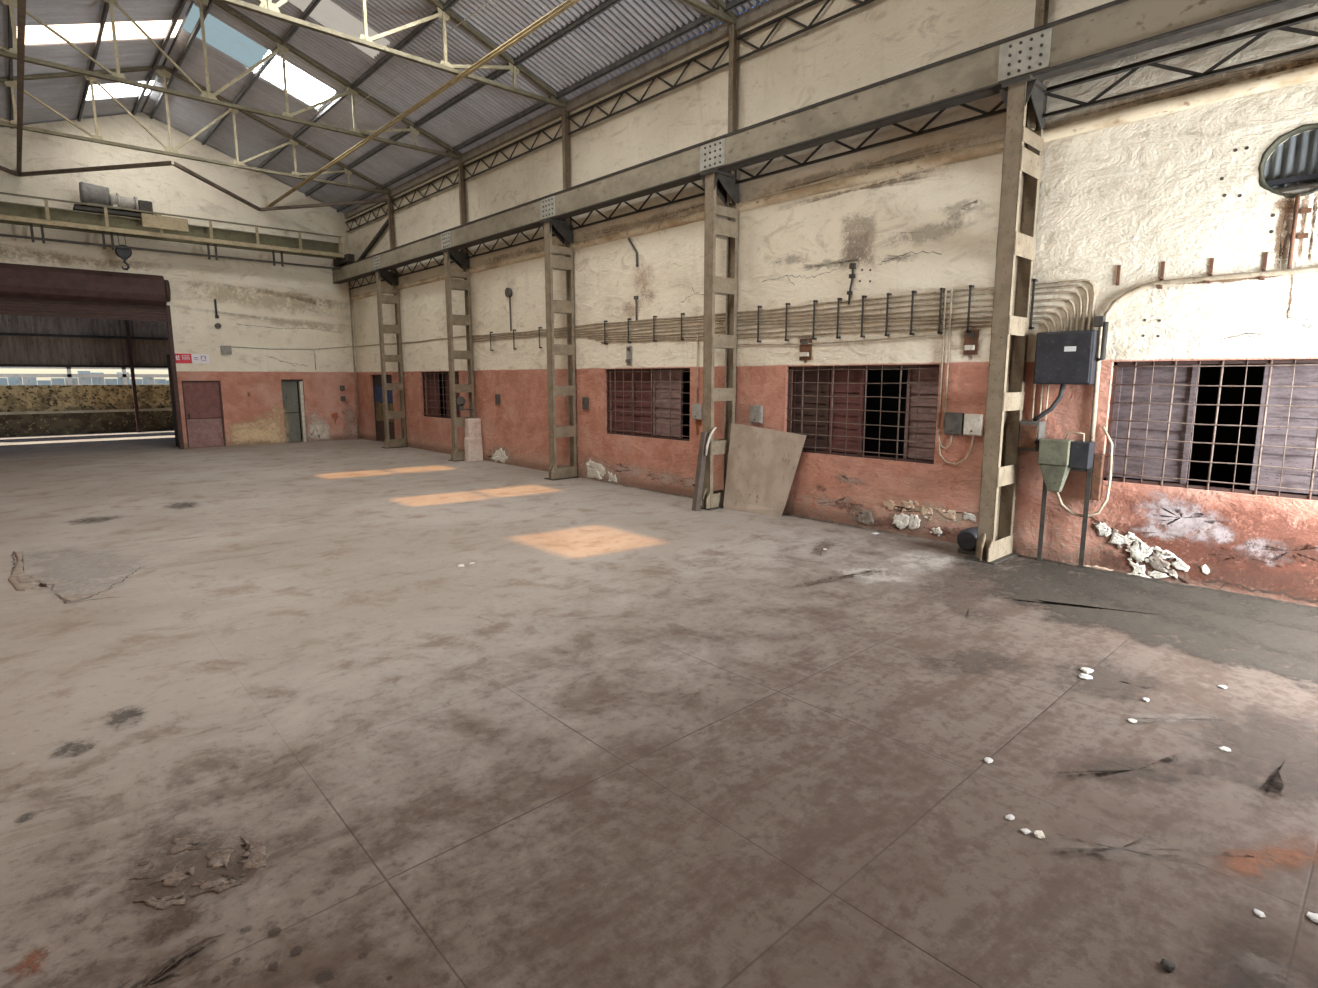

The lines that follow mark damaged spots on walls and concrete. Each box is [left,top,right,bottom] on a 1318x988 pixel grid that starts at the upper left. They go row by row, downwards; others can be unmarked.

rust [1183,194,1318,321]
peeling [849,500,976,537]
peeling [1083,494,1289,579]
spalling [8,551,98,602]
spalling [129,834,270,910]